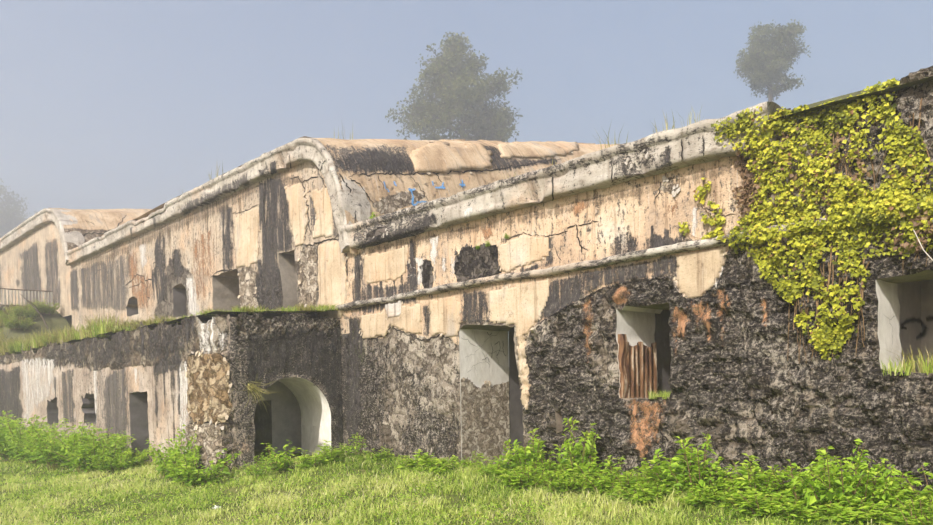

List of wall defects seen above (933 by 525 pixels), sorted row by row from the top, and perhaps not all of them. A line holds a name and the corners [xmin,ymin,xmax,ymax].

leakage [484,145,557,171]
leakage [0,161,304,443]
leakage [244,180,662,447]
spalling [453,233,551,282]
peeling [487,277,550,410]
crack [502,220,598,261]
leakage [536,208,698,325]
corrosion [612,286,627,304]
corrosion [674,290,730,355]
peeling [676,247,729,298]
spalling [184,349,233,465]
corrosion [629,399,666,458]